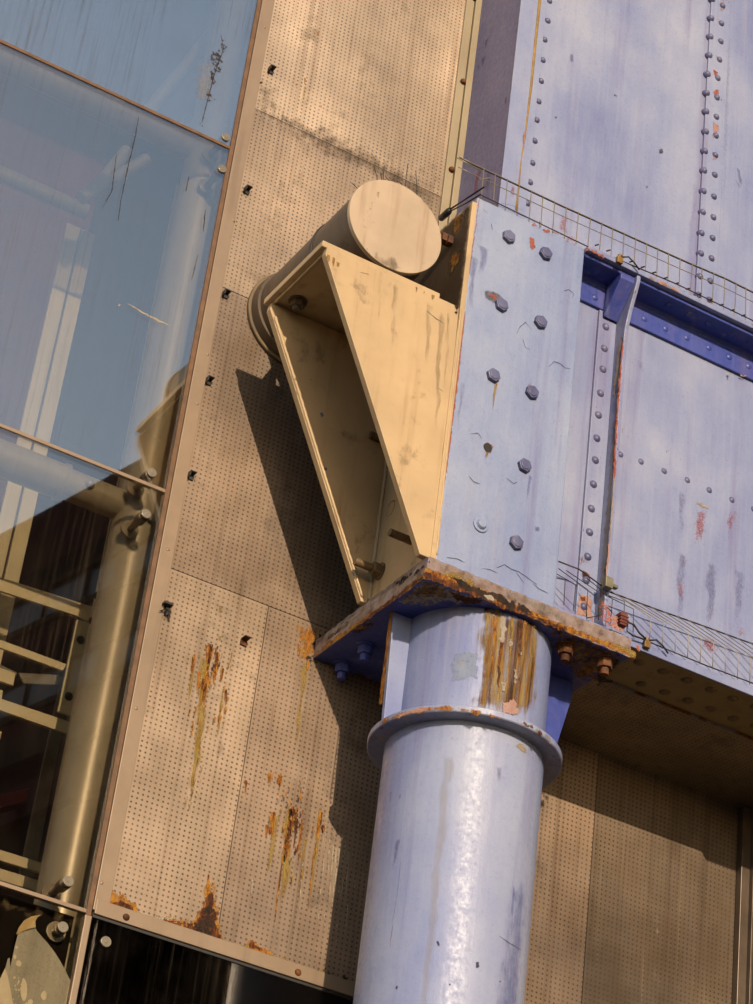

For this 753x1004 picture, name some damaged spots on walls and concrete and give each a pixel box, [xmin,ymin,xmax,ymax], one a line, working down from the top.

rust [445,305,466,481]
rust [186,636,232,805]
rust [297,554,640,741]
rust [110,891,138,912]
rust [155,875,222,939]
rust [265,772,326,917]